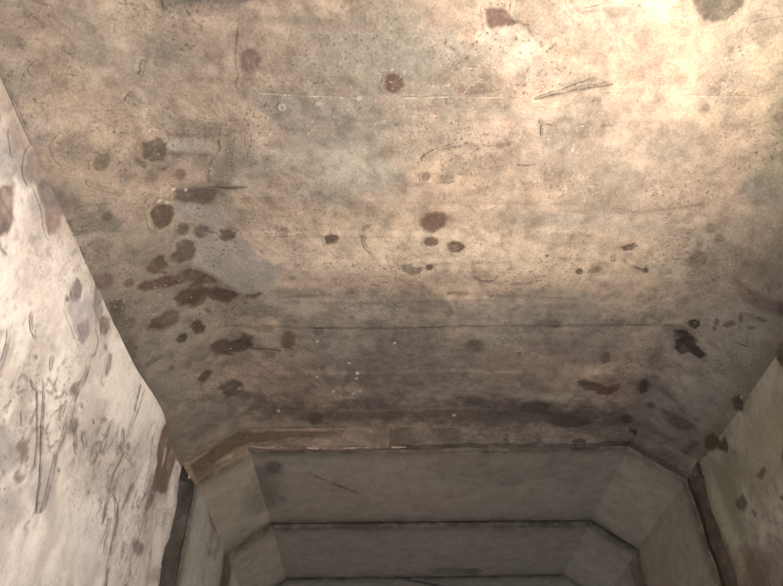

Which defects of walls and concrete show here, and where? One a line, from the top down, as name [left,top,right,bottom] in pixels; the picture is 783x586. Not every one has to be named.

water stain [142,0,394,37]
water stain [681,0,783,42]
rust [0,128,74,270]
water stain [710,273,783,332]
water stain [102,343,113,386]
water stain [106,297,151,385]
water stain [461,337,487,355]
water stain [514,399,595,428]
mould [636,376,658,409]
rust [143,410,343,515]
mould [698,428,732,459]
crack [366,575,448,586]